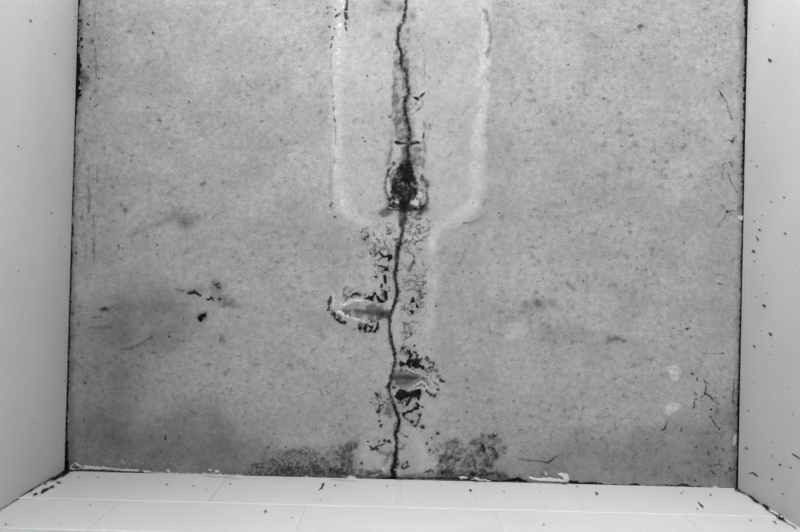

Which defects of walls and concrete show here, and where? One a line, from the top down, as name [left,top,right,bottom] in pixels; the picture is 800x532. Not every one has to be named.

crack [396,1,425,175]
leakage [384,95,428,213]
spalling [327,289,392,333]
crack [377,205,530,483]
spalling [392,345,445,429]
leakage [250,445,386,478]
leakage [426,432,500,480]
peeling [529,471,569,483]